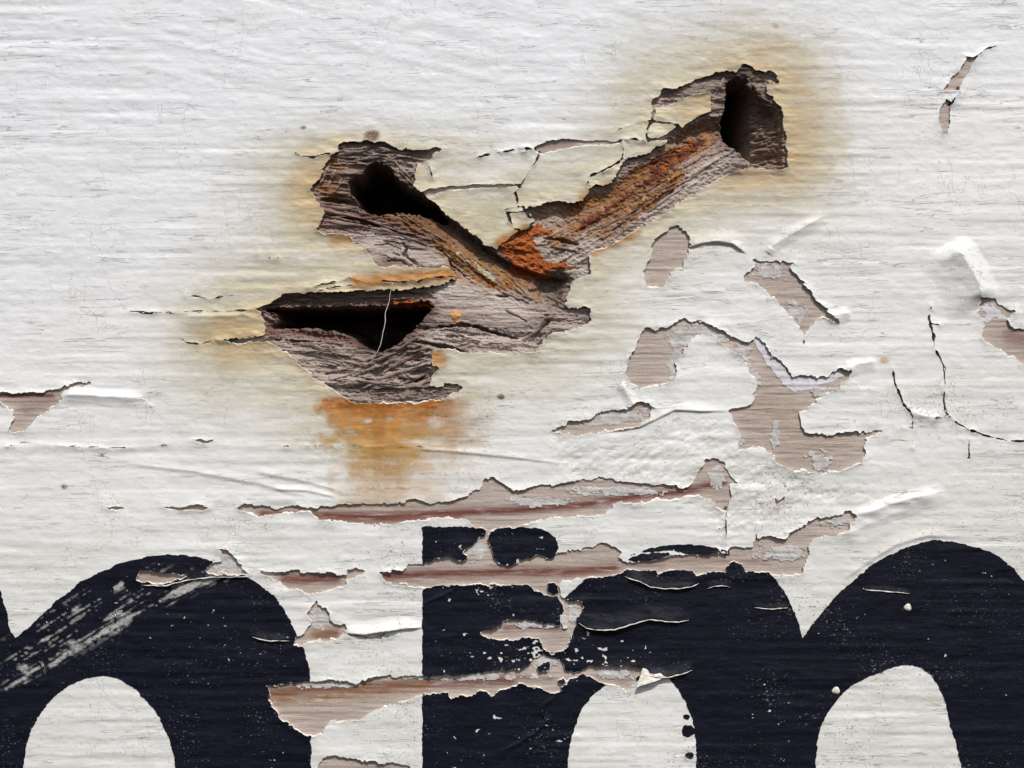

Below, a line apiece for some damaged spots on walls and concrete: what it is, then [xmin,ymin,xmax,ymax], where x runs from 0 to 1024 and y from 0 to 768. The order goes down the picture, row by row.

crack [478,147,541,232]
corrosion [352,94,718,293]
crack [587,120,652,183]
corrosion [721,61,818,187]
peeling [421,282,591,353]
peeling [744,259,839,344]
peeling [0,381,91,433]
corrosion [317,398,457,475]
peeling [551,318,881,474]
crack [892,307,1024,458]
peeling [137,549,247,604]
peeling [238,458,856,735]